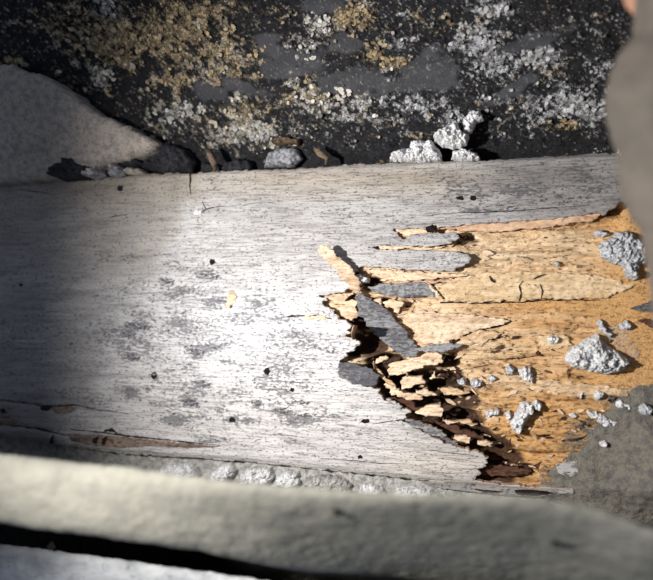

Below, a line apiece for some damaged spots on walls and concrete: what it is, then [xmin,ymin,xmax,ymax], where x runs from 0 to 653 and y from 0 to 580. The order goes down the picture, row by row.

peeling [556,461,578,480]